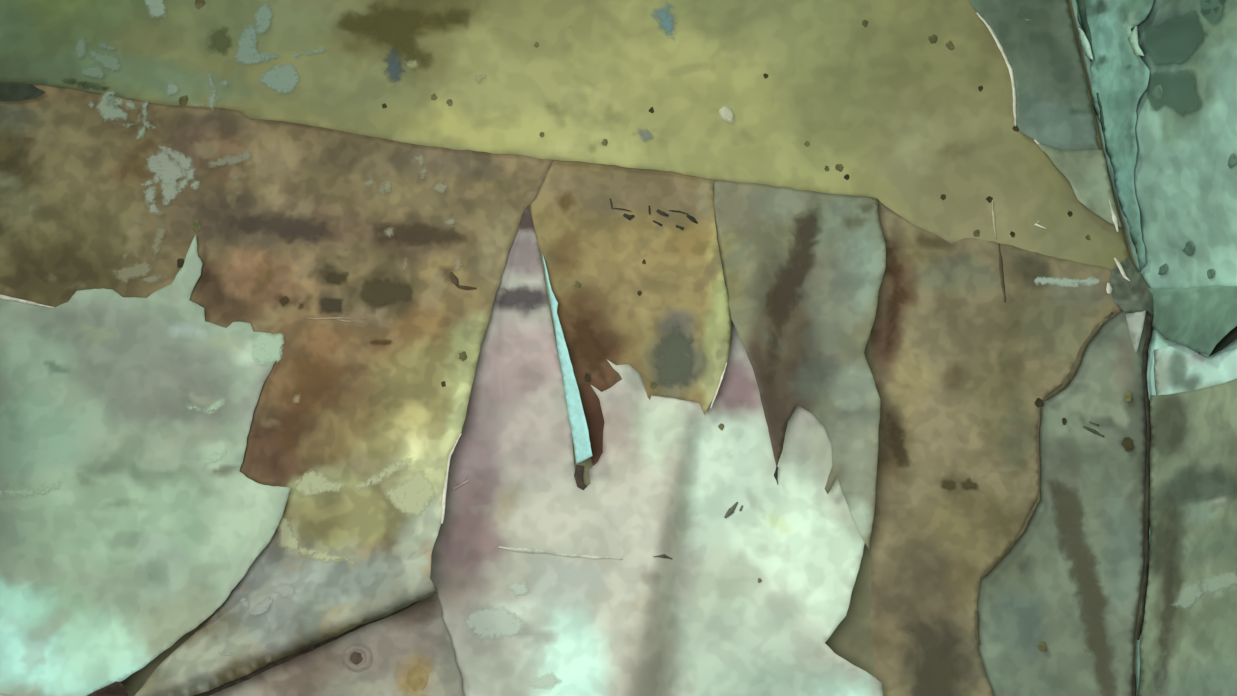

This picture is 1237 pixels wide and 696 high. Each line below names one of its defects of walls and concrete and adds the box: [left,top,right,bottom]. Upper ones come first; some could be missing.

peeling [236,4,323,93]
damp [341,10,466,81]
peeling [90,92,155,139]
spalling [1076,0,1168,275]
peeling [142,146,199,213]
peeling [252,334,283,365]
flaking render [1154,343,1237,395]
peeling [295,458,434,516]
crack [981,312,1113,579]
crack [1137,314,1154,640]
crack [974,611,982,645]
crack [1131,673,1139,696]